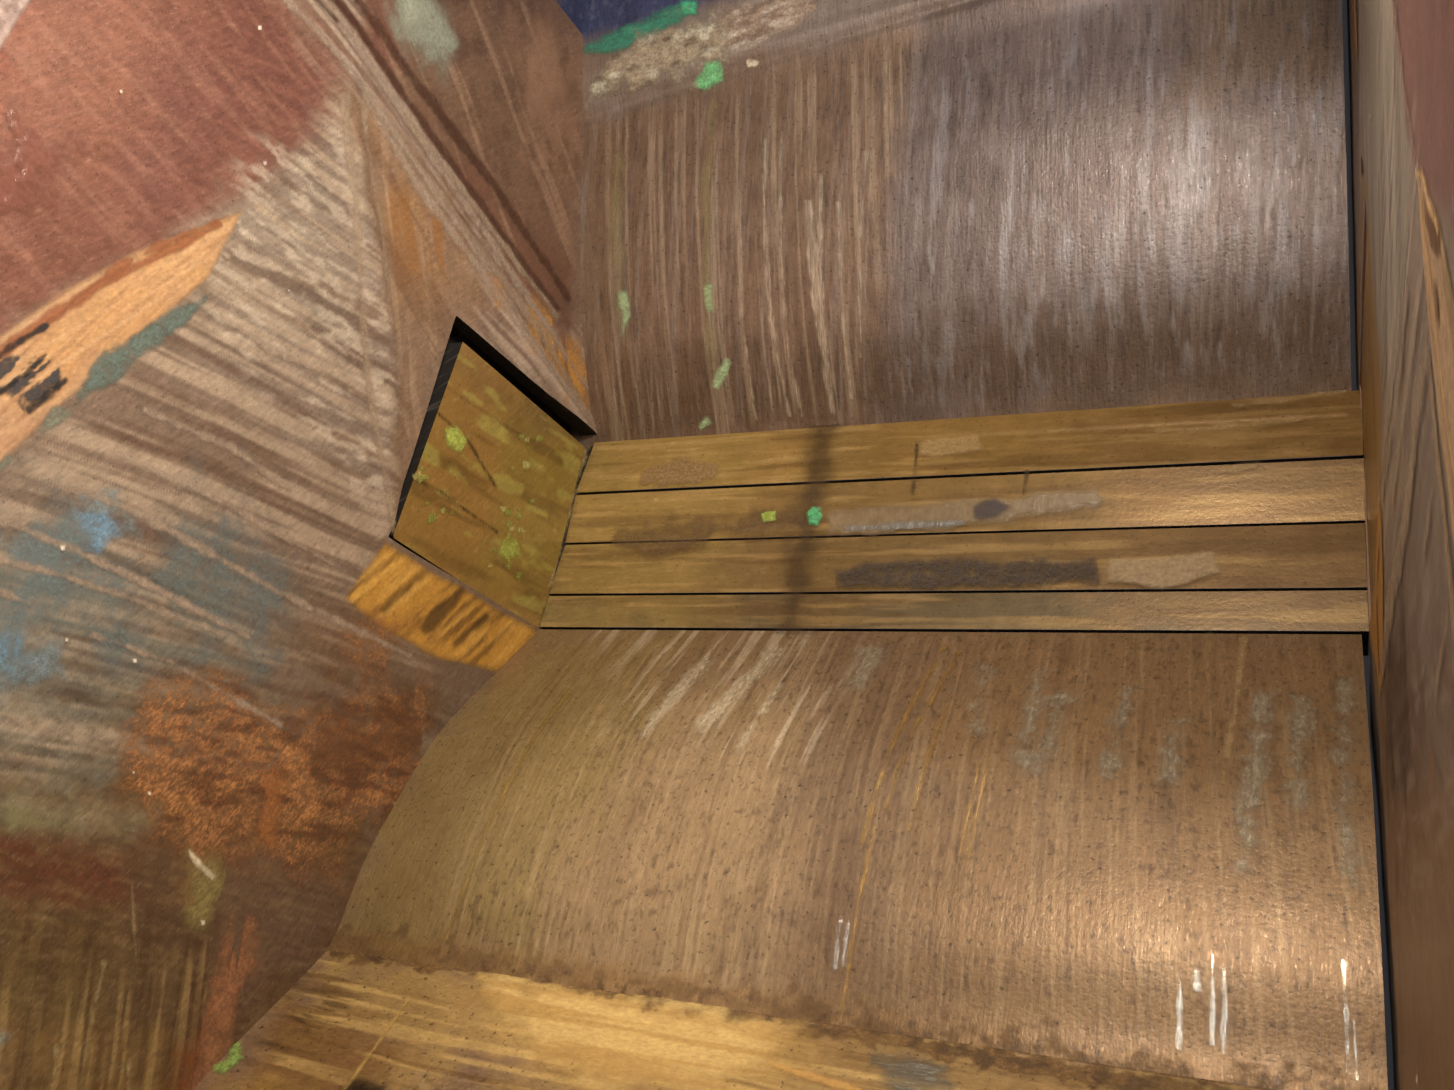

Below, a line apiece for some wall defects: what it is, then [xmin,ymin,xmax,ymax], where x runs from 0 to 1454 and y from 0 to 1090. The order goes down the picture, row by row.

corrosion [124,545,536,875]